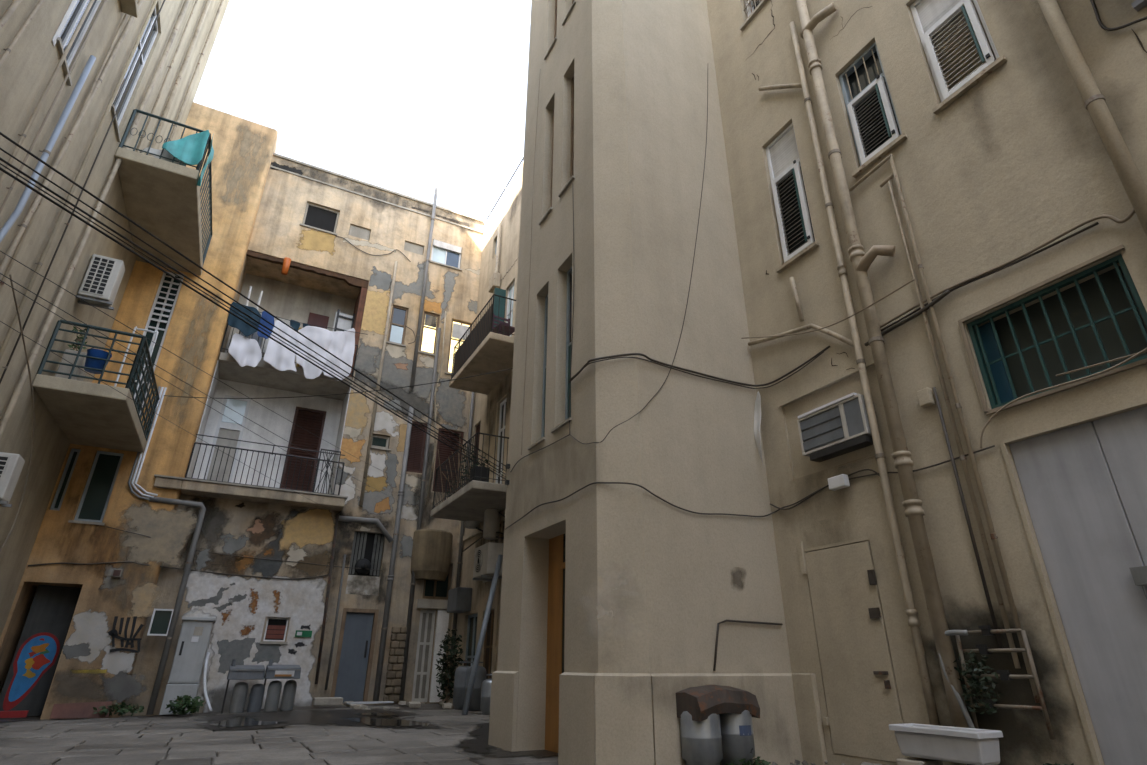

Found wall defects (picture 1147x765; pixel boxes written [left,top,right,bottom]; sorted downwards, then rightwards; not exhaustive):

peeling [297,230,396,255]
peeling [334,262,467,532]
peeling [63,609,147,703]
peeling [99,504,335,713]